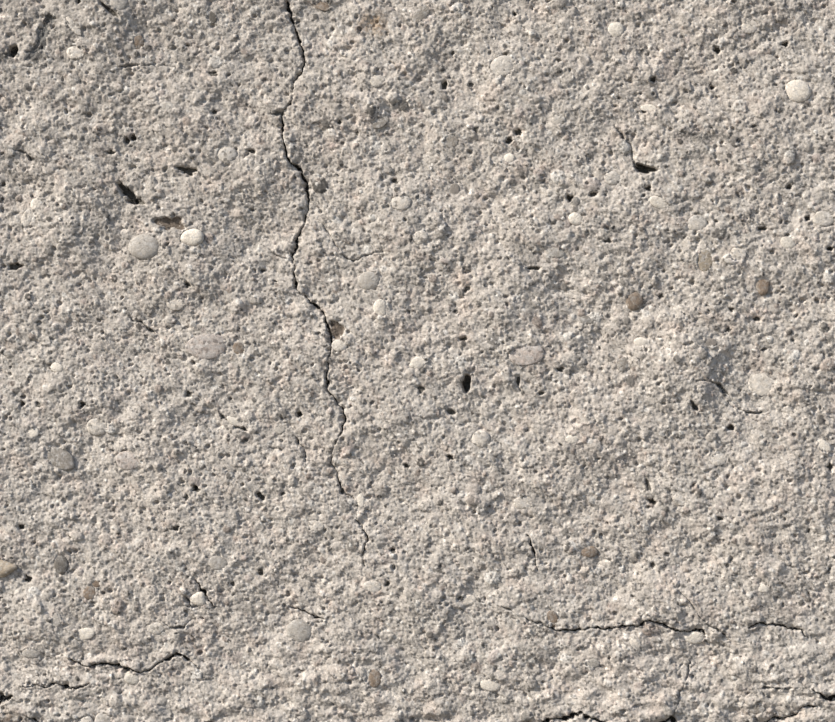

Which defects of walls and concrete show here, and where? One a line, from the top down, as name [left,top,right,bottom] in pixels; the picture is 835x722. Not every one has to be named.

crack [269,1,381,566]
crack [504,583,727,637]
crack [748,622,807,637]
crack [0,652,208,705]
crack [542,711,604,722]
crack [661,657,692,722]
crack [763,686,835,722]